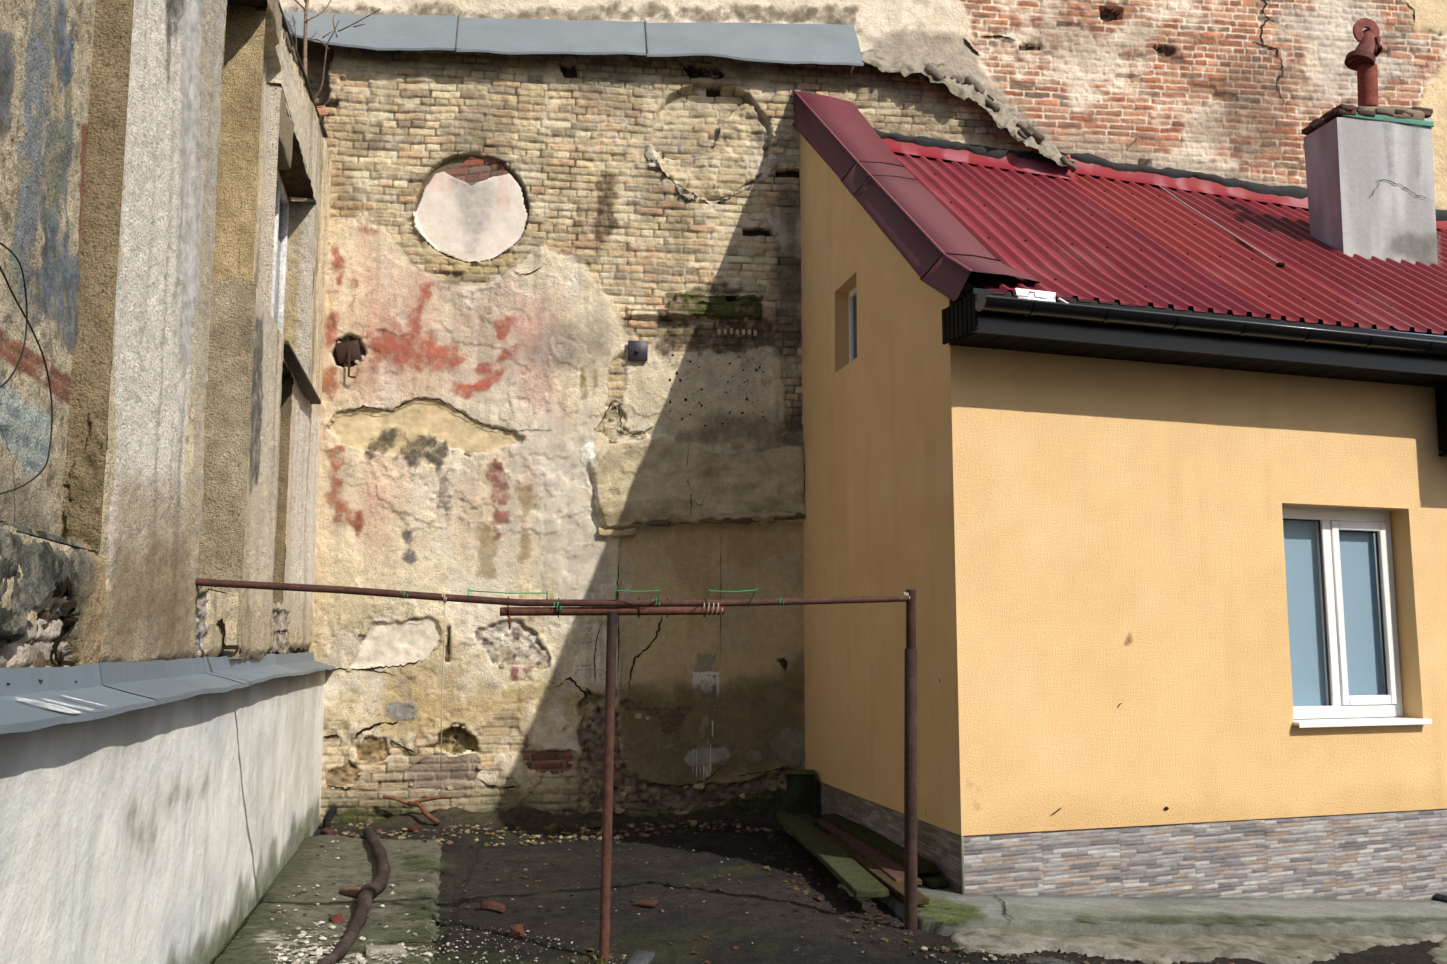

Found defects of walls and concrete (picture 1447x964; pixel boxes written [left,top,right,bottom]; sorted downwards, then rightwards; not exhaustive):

crack [1251,0,1288,115]
flaking render [333,335,366,367]
flaking render [327,397,524,456]
flaking render [595,401,657,442]
spalling [0,595,75,668]
flaking render [347,617,441,672]
flaking render [475,620,550,670]
crack [557,556,662,698]
flaking render [325,761,362,789]
flaking render [407,723,484,790]
flaking render [522,691,650,814]